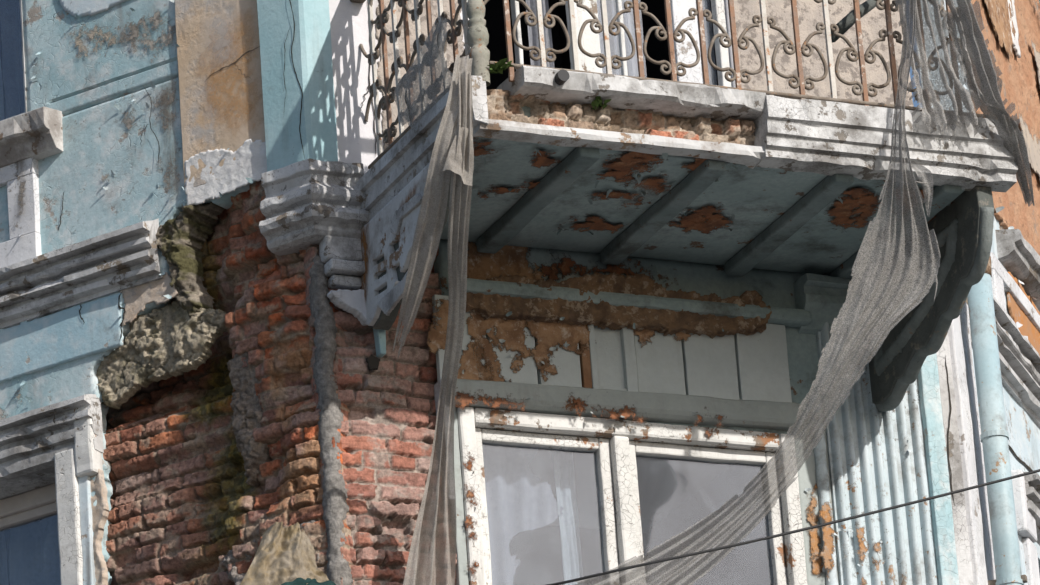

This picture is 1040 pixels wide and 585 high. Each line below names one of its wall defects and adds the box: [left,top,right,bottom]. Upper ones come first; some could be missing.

peeling [70,0,179,63]
peeling [156,139,267,206]
crack [205,0,305,158]
spalling [486,89,756,235]
flaking render [971,0,1040,256]
flaking render [96,271,227,409]
flaking render [227,352,272,488]
spalling [366,354,380,370]
peeling [455,311,590,411]
crack [945,356,955,505]
flaking render [1007,272,1040,356]
flaking render [805,483,886,585]